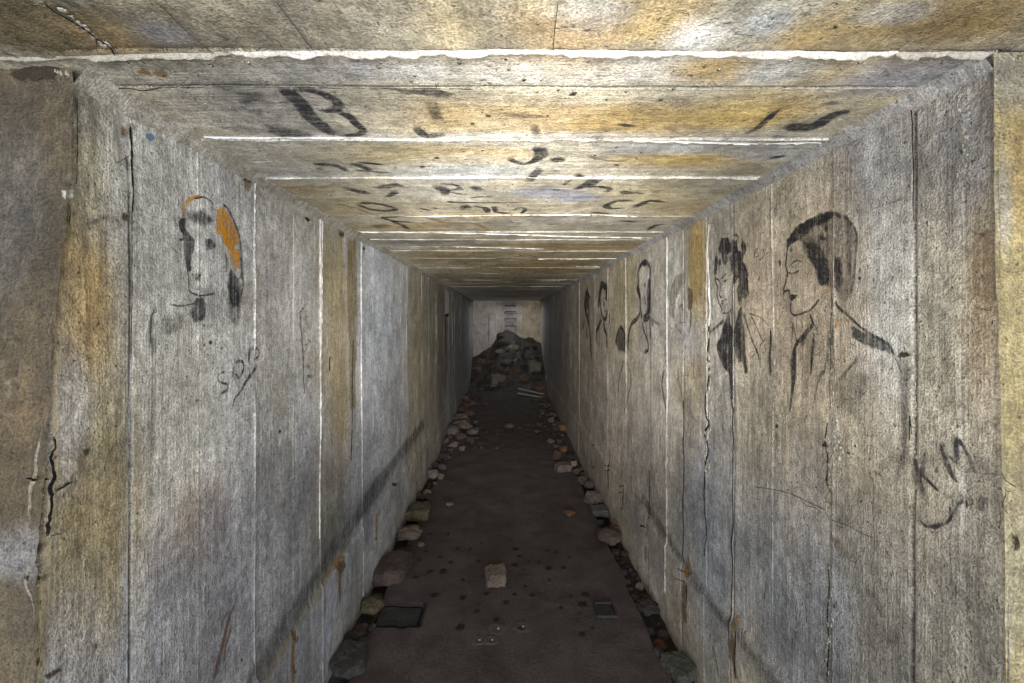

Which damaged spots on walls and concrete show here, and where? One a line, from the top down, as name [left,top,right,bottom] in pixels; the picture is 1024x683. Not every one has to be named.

crack [35,647,43,667]
crack [24,436,73,619]
rust [333,557,346,603]
crack [682,282,876,682]